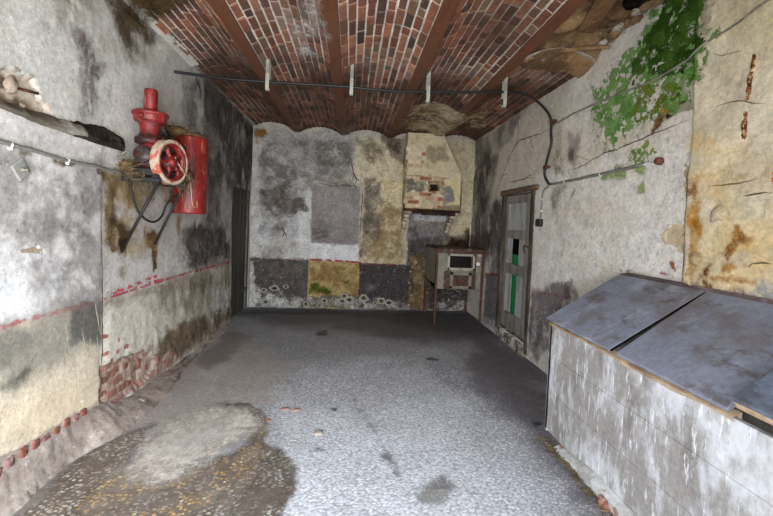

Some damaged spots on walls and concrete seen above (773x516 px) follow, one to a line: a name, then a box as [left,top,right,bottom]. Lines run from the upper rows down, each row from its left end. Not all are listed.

leakage [110,0,156,53]
leakage [186,78,308,292]
flaking render [403,144,456,209]
crack [496,121,545,192]
crack [567,120,687,171]
crack [713,178,772,196]
flaking render [659,220,685,253]
crack [680,169,689,275]
leakage [158,301,231,366]
flaking render [99,338,177,403]
flaking render [0,398,92,476]
leakage [21,403,297,516]